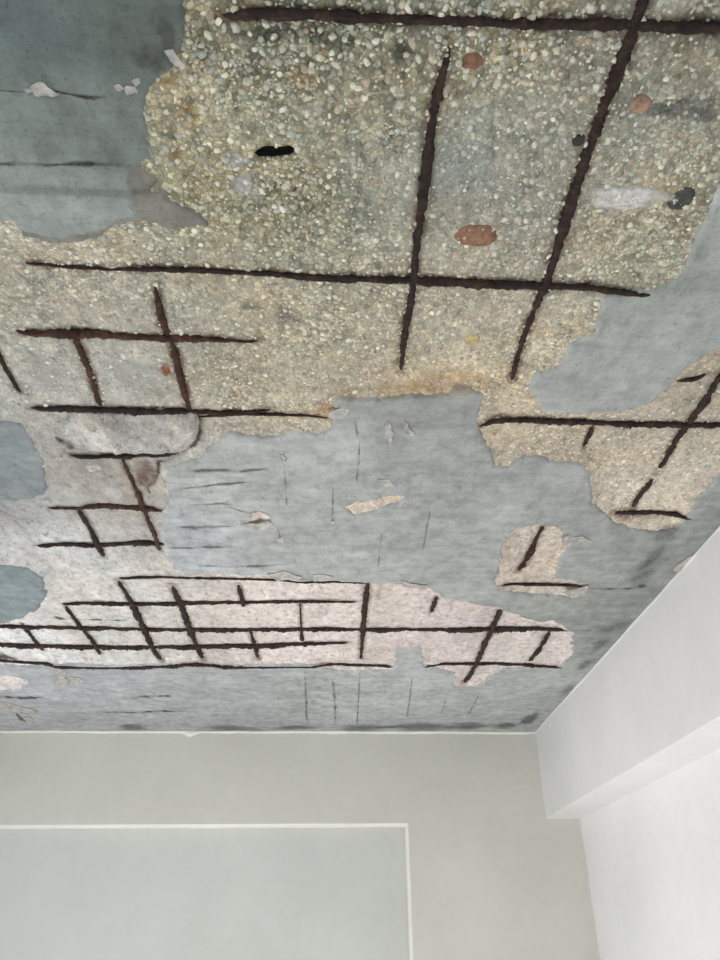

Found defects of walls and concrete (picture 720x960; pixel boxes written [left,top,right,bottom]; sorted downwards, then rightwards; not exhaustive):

rust [25,0,720,380]
rust [0,352,21,393]
rust [16,286,328,419]
spalling [0,0,720,690]
rust [479,373,720,468]
rust [37,452,179,557]
rust [614,479,692,520]
rust [0,576,567,683]